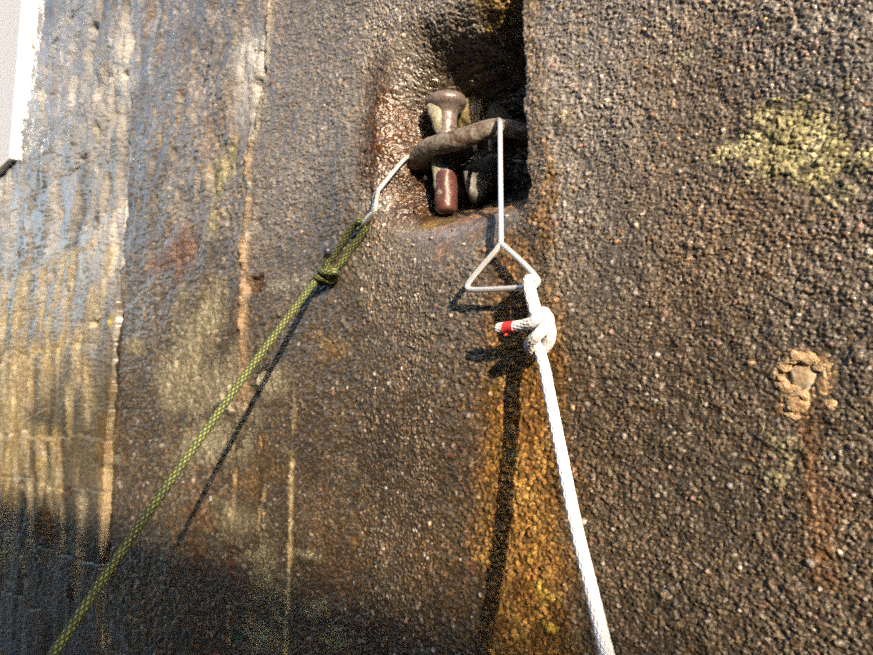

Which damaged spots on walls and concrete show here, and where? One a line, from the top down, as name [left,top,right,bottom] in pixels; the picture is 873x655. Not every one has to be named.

leakage [211,32,271,229]
corrosion [504,244,527,321]
leakage [0,249,91,546]
spalling [774,350,838,421]
leakage [76,494,86,568]
leakage [98,416,116,554]
corrosion [479,329,561,655]